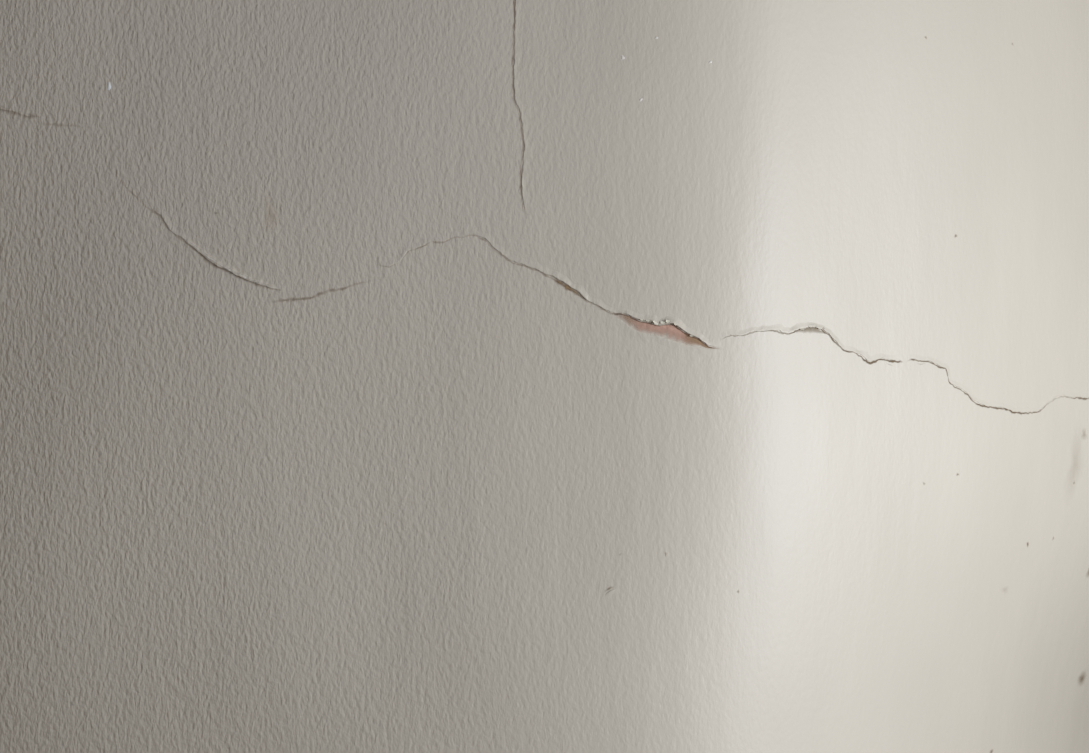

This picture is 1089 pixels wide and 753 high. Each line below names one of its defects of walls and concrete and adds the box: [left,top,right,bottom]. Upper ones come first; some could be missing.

spalling [608,306,722,358]
crack [721,322,1089,414]